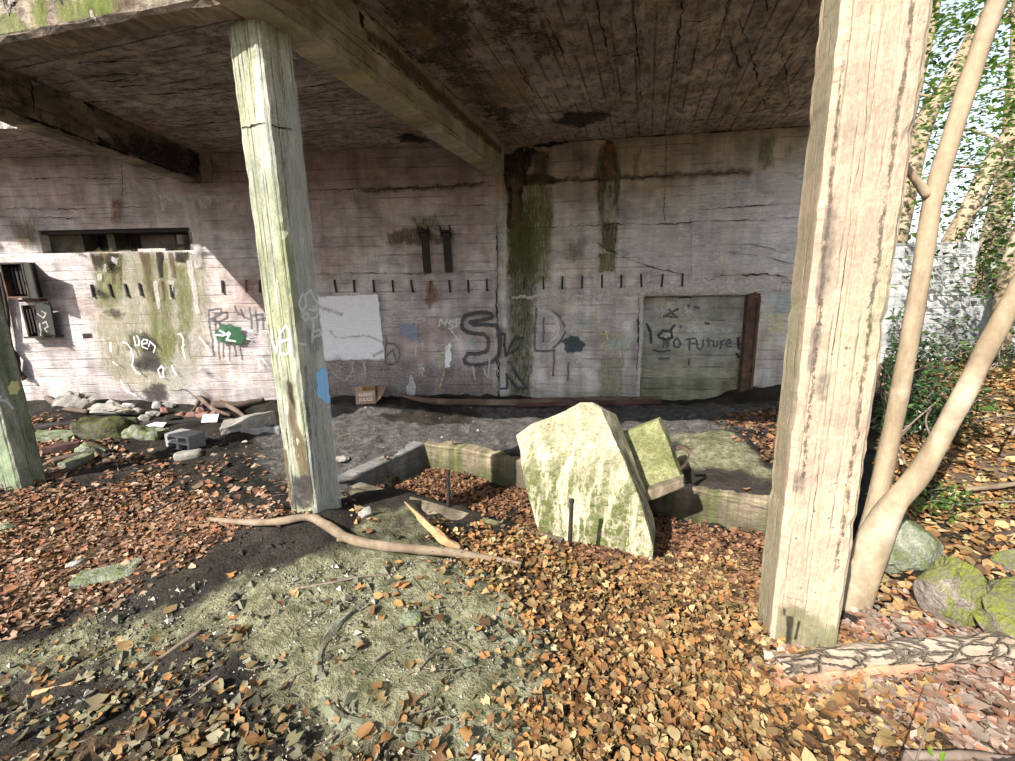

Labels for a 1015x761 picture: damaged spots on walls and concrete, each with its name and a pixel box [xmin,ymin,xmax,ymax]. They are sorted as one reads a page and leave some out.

crack [0,60,387,219]
crack [297,3,501,397]
water stain [367,0,559,396]
crack [479,0,574,114]
water stain [555,112,611,128]
water stain [597,143,620,272]
crack [525,0,806,282]
water stain [90,252,206,396]